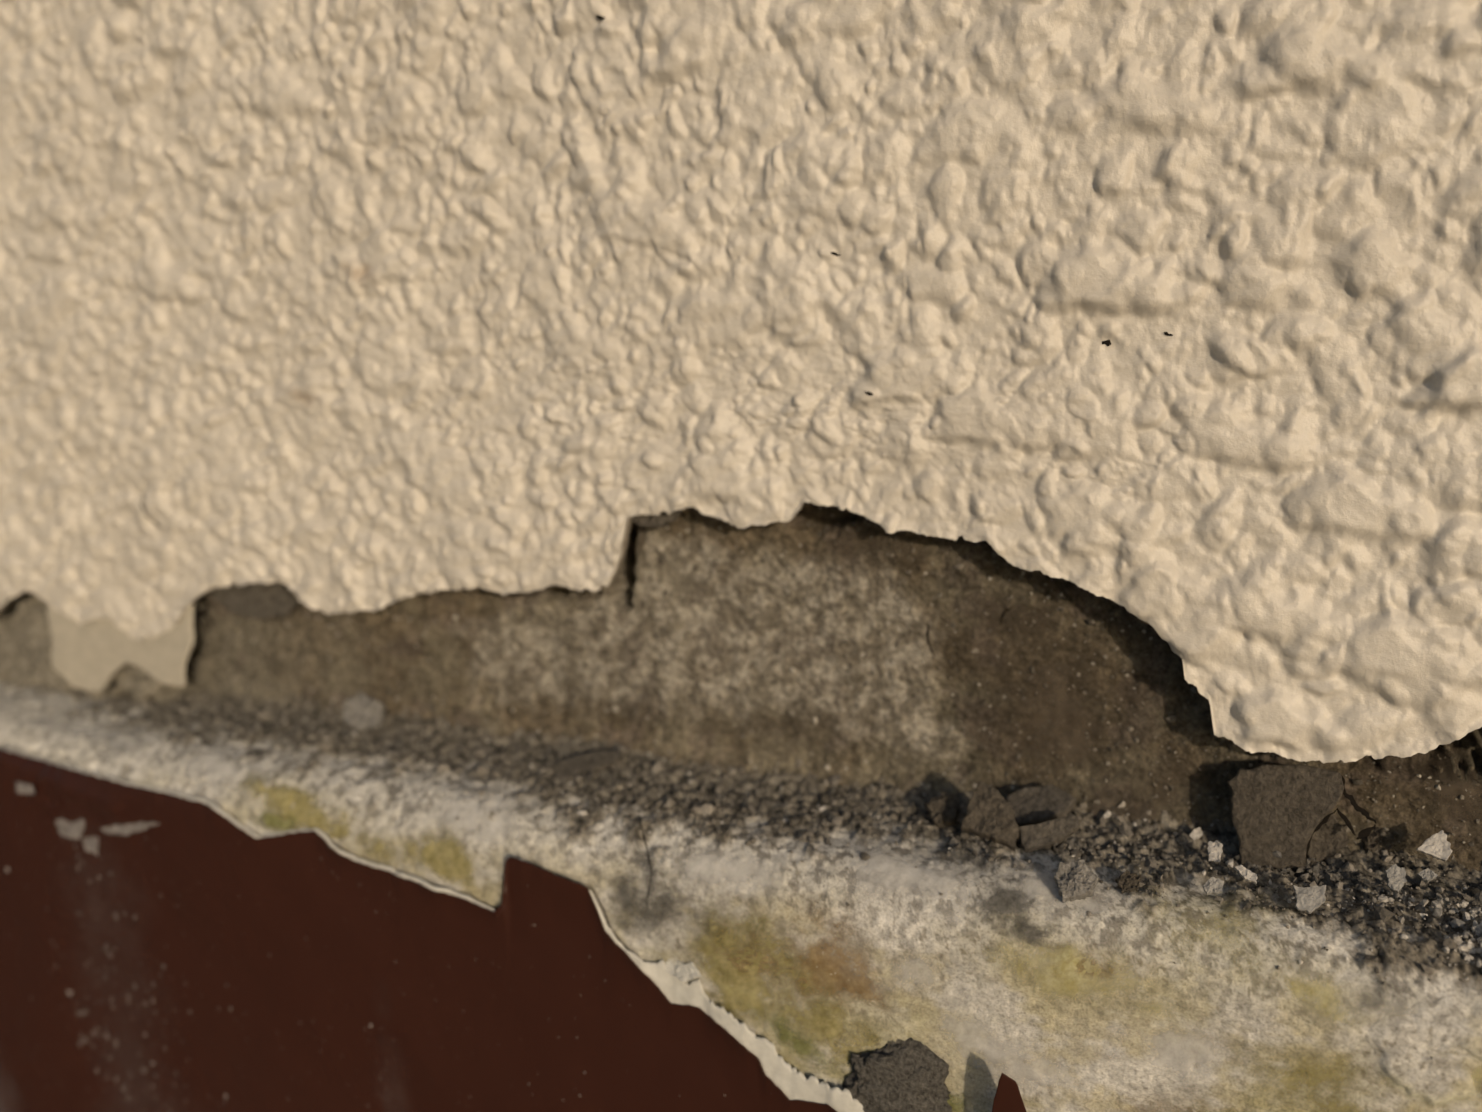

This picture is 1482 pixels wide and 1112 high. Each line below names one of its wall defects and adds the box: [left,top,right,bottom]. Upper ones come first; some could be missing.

leakage [188,753,348,840]
leakage [406,783,513,885]
leakage [614,852,676,931]
leakage [687,855,769,885]
peeling [0,502,1482,1112]
leakage [858,836,1136,997]
leakage [1409,741,1482,822]
leakage [696,919,879,1064]
leakage [1270,1060,1362,1112]